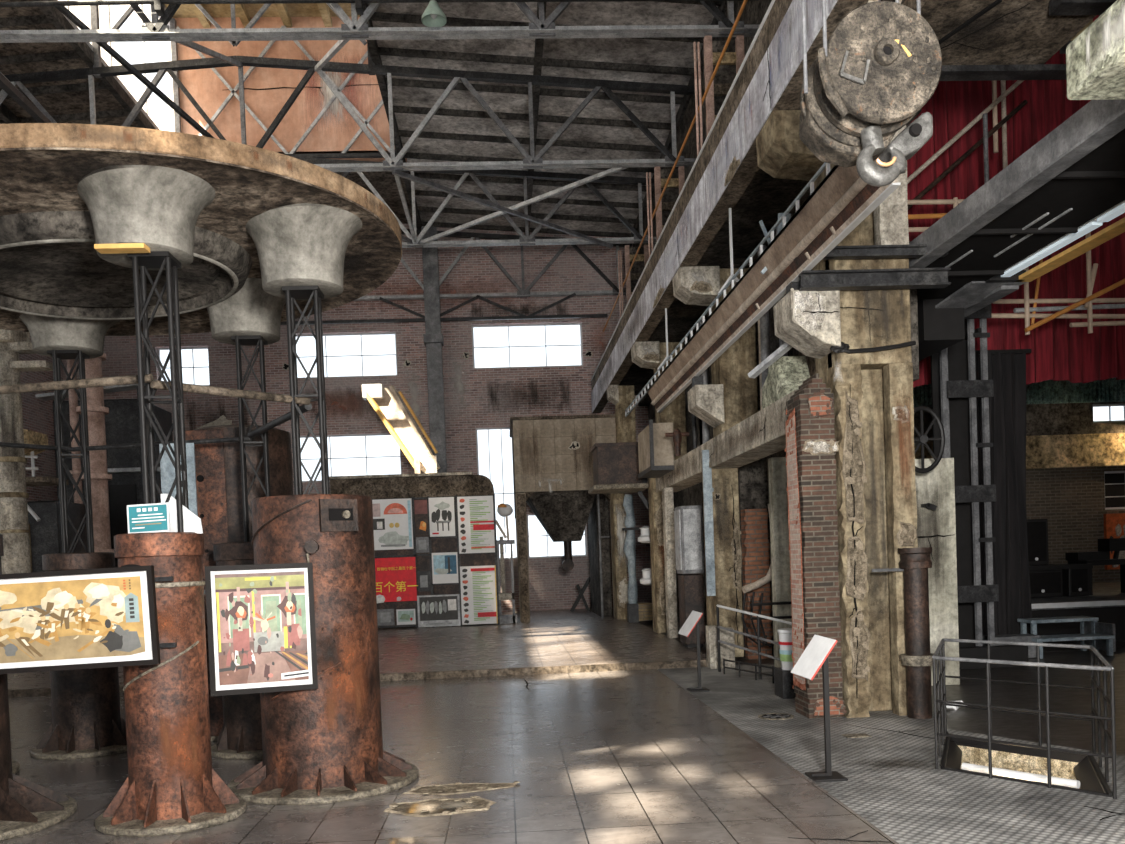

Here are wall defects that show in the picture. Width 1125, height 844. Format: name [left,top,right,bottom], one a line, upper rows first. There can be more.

peeling [785,388,870,690]
crack [849,384,863,692]
crack [917,534,955,561]
corrosion [157,614,182,634]
corrosion [324,642,363,718]
spalling [813,695,847,717]